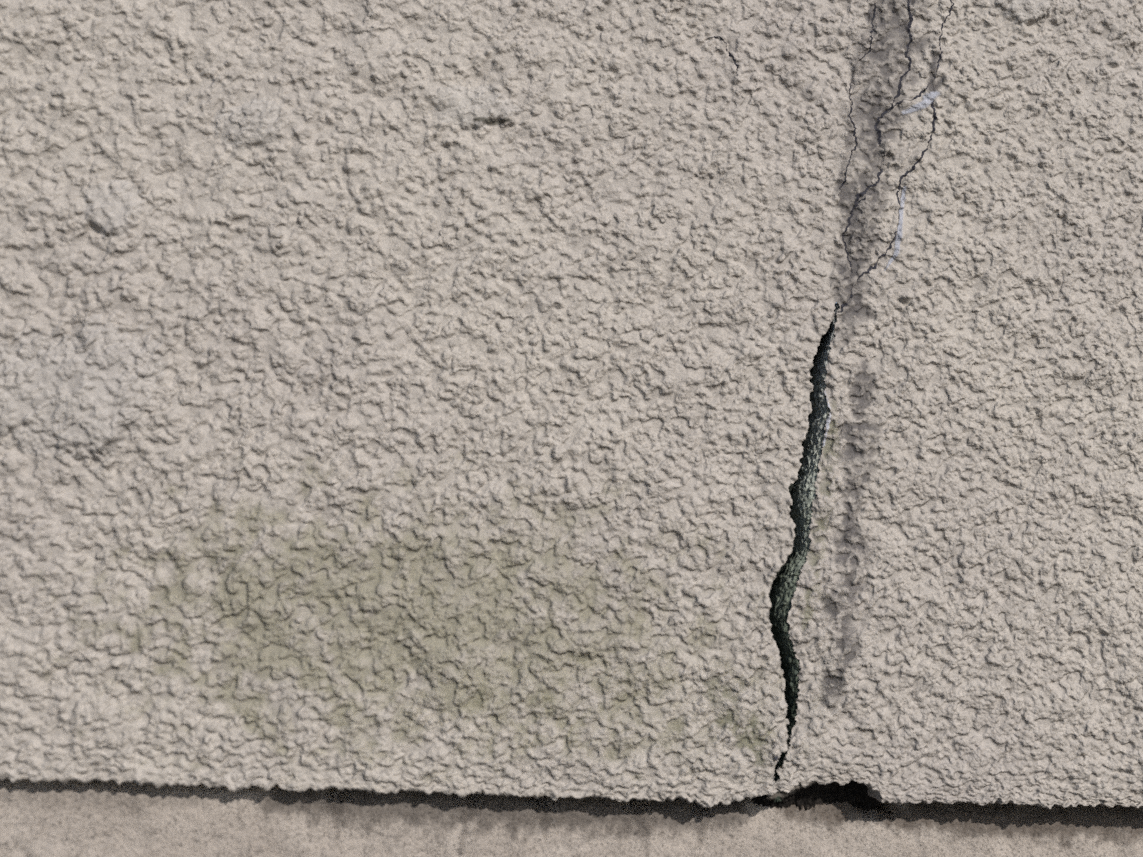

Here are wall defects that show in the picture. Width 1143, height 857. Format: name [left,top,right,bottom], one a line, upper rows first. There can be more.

crack [764,0,954,803]